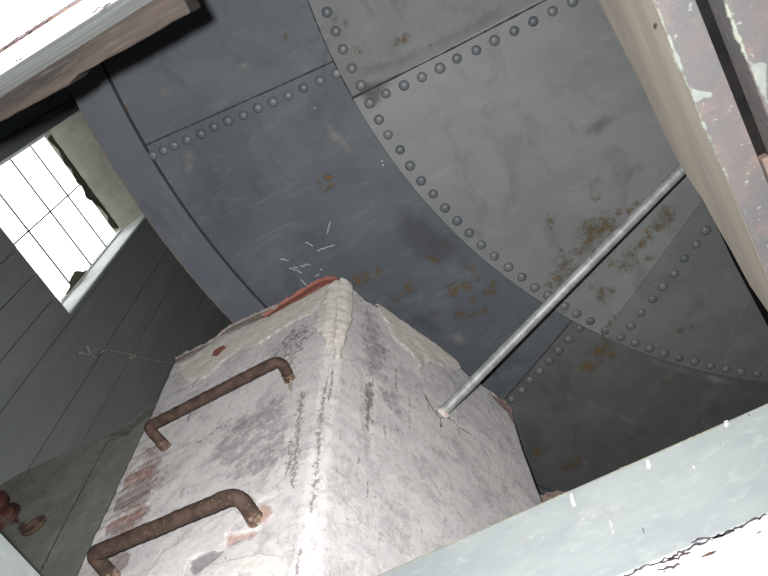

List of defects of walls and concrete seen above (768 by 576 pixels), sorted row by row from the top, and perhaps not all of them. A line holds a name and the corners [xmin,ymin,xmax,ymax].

peeling [658,8,718,155]
peeling [725,4,768,103]
flaking render [376,304,461,372]
crack [424,394,471,435]
peeling [379,404,768,576]